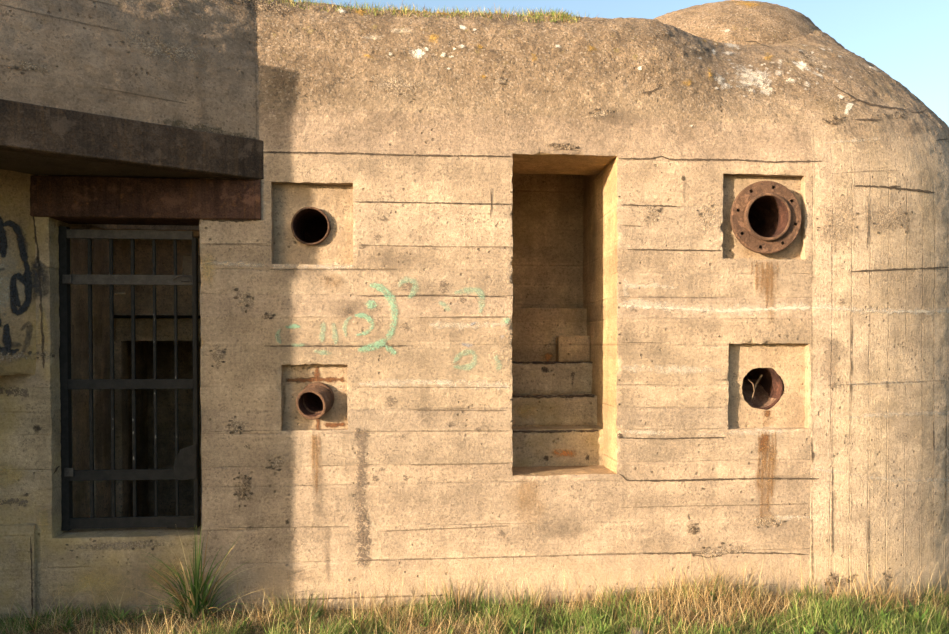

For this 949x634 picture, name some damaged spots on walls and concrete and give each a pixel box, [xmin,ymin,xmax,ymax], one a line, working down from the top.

crack [835,86,927,121]
corrosion [759,434,772,460]
damp [354,428,385,566]